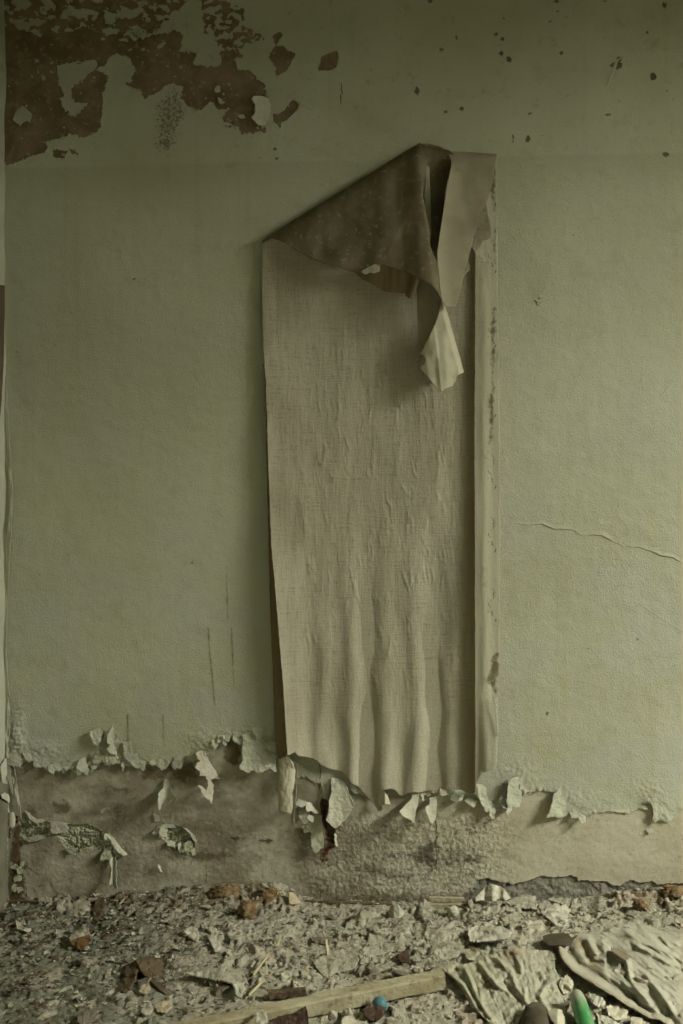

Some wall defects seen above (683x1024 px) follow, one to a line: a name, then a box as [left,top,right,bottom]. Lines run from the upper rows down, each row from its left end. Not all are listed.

peeling [4,0,314,165]
crack [510,520,683,563]
flaking render [0,697,683,921]